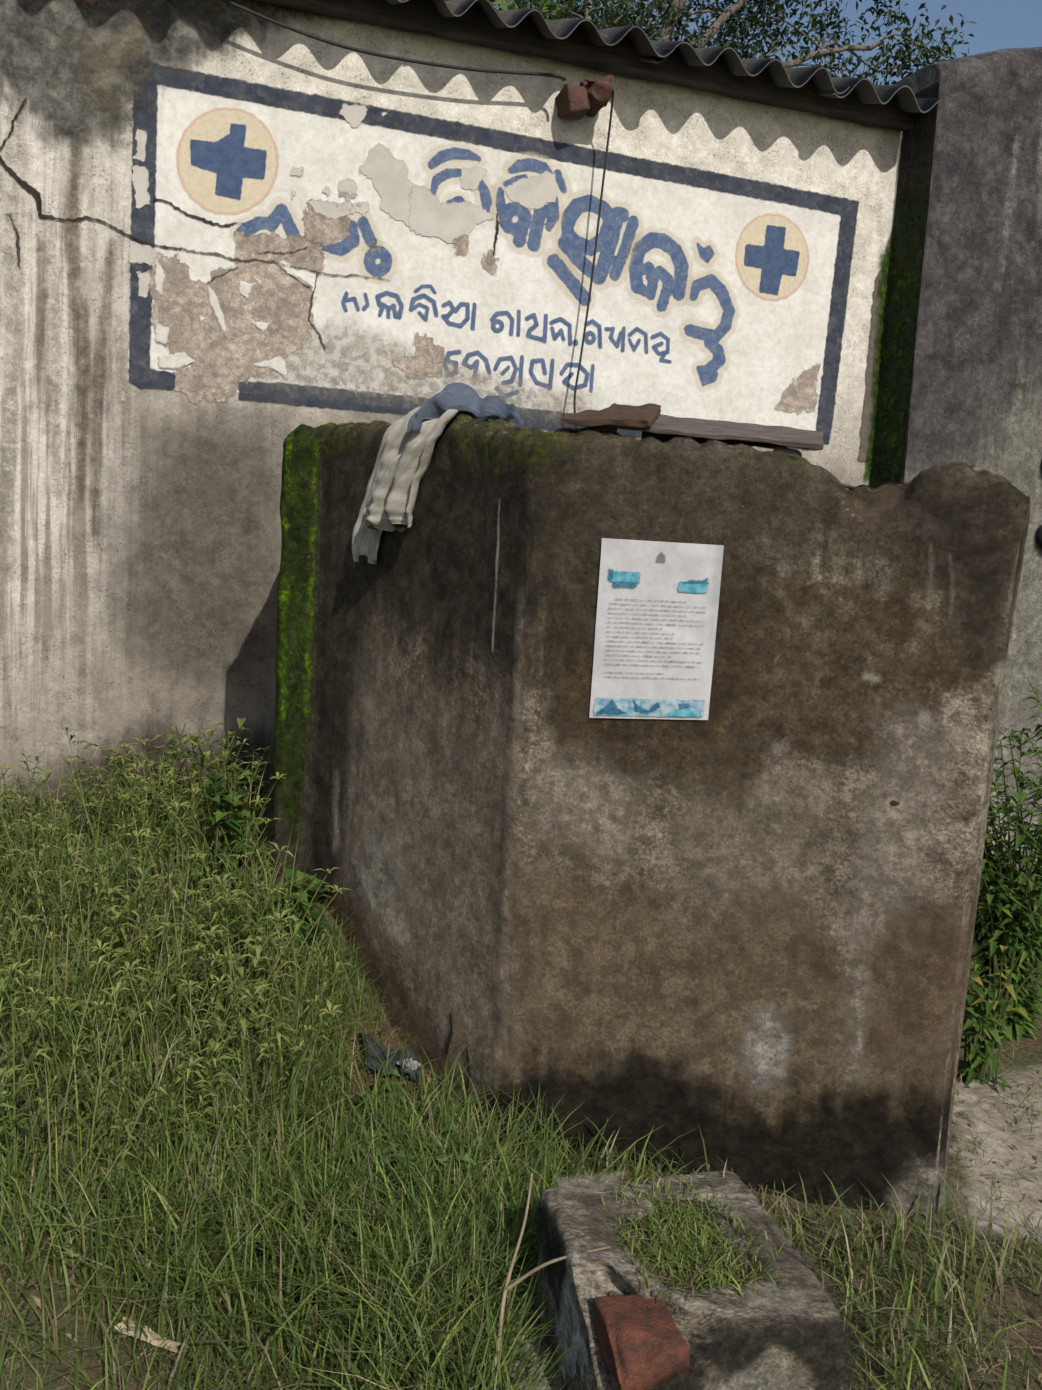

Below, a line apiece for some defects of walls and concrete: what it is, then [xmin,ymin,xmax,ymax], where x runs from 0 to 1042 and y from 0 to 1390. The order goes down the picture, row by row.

peeling [131,129,150,208]
crack [0,98,390,349]
peeling [129,143,499,404]
peeling [339,103,387,128]
peeling [505,171,558,210]
peeling [775,364,821,415]
water stain [129,422,353,721]
water stain [2,733,291,882]
water stain [847,713,944,944]
water stain [326,891,954,1240]
water stain [533,1192,588,1382]
water stain [653,1213,860,1390]